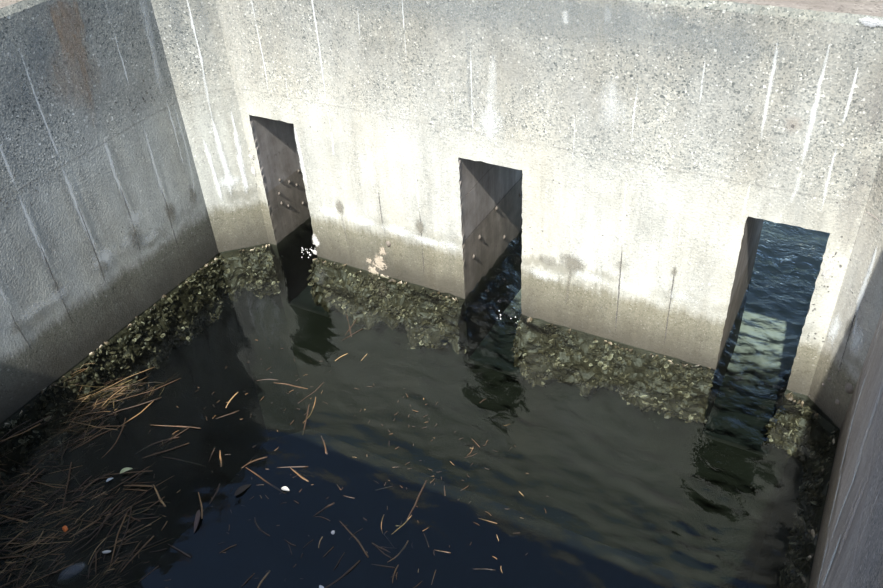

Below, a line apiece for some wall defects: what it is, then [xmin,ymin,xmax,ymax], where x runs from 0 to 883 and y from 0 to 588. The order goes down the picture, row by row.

leakage [205,117,248,197]
leakage [566,255,583,270]
crack [614,253,622,330]
crack [665,269,676,338]